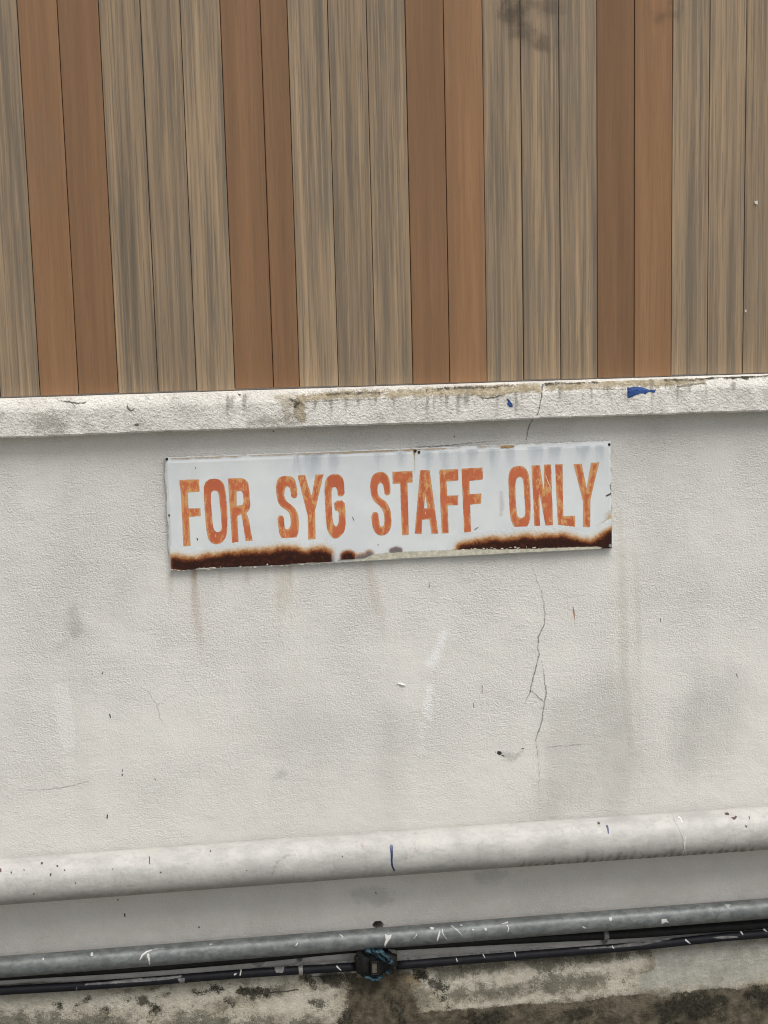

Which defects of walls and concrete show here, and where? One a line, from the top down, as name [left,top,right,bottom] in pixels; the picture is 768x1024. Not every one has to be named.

water stain [290,375,768,408]
crack [528,620,547,738]
water stain [173,950,648,1024]
water stain [0,995,130,1024]
water stain [127,992,169,1016]